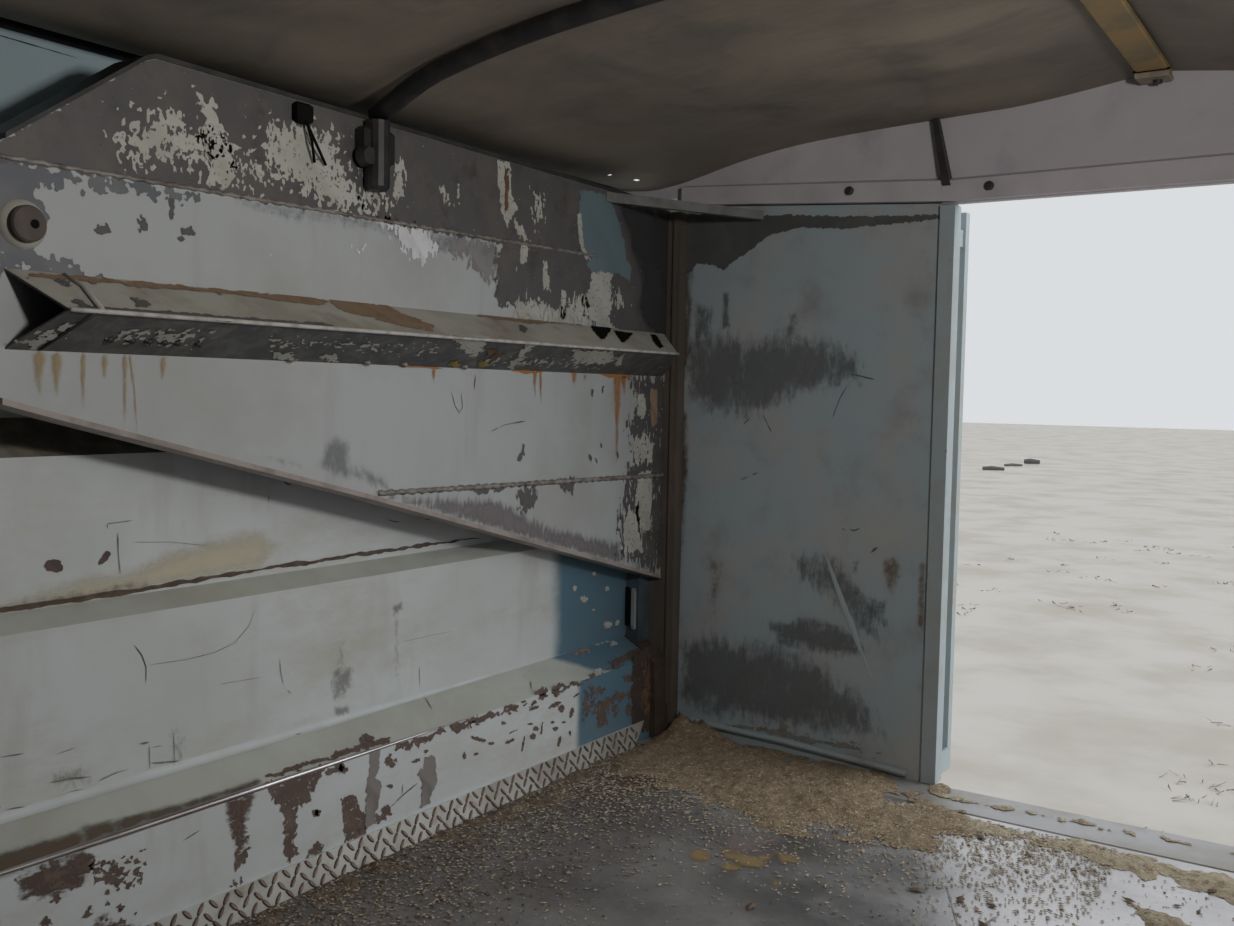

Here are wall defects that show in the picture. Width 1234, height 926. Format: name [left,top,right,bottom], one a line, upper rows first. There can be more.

peeling [0,59,670,333]
peeling [14,322,75,350]
corrosion [35,353,60,385]
peeling [106,328,216,350]
peeling [269,333,626,370]
corrosion [601,374,633,444]
peeling [413,375,665,573]
peeling [44,559,63,573]
corrosion [630,642,659,732]
peeling [0,619,641,926]